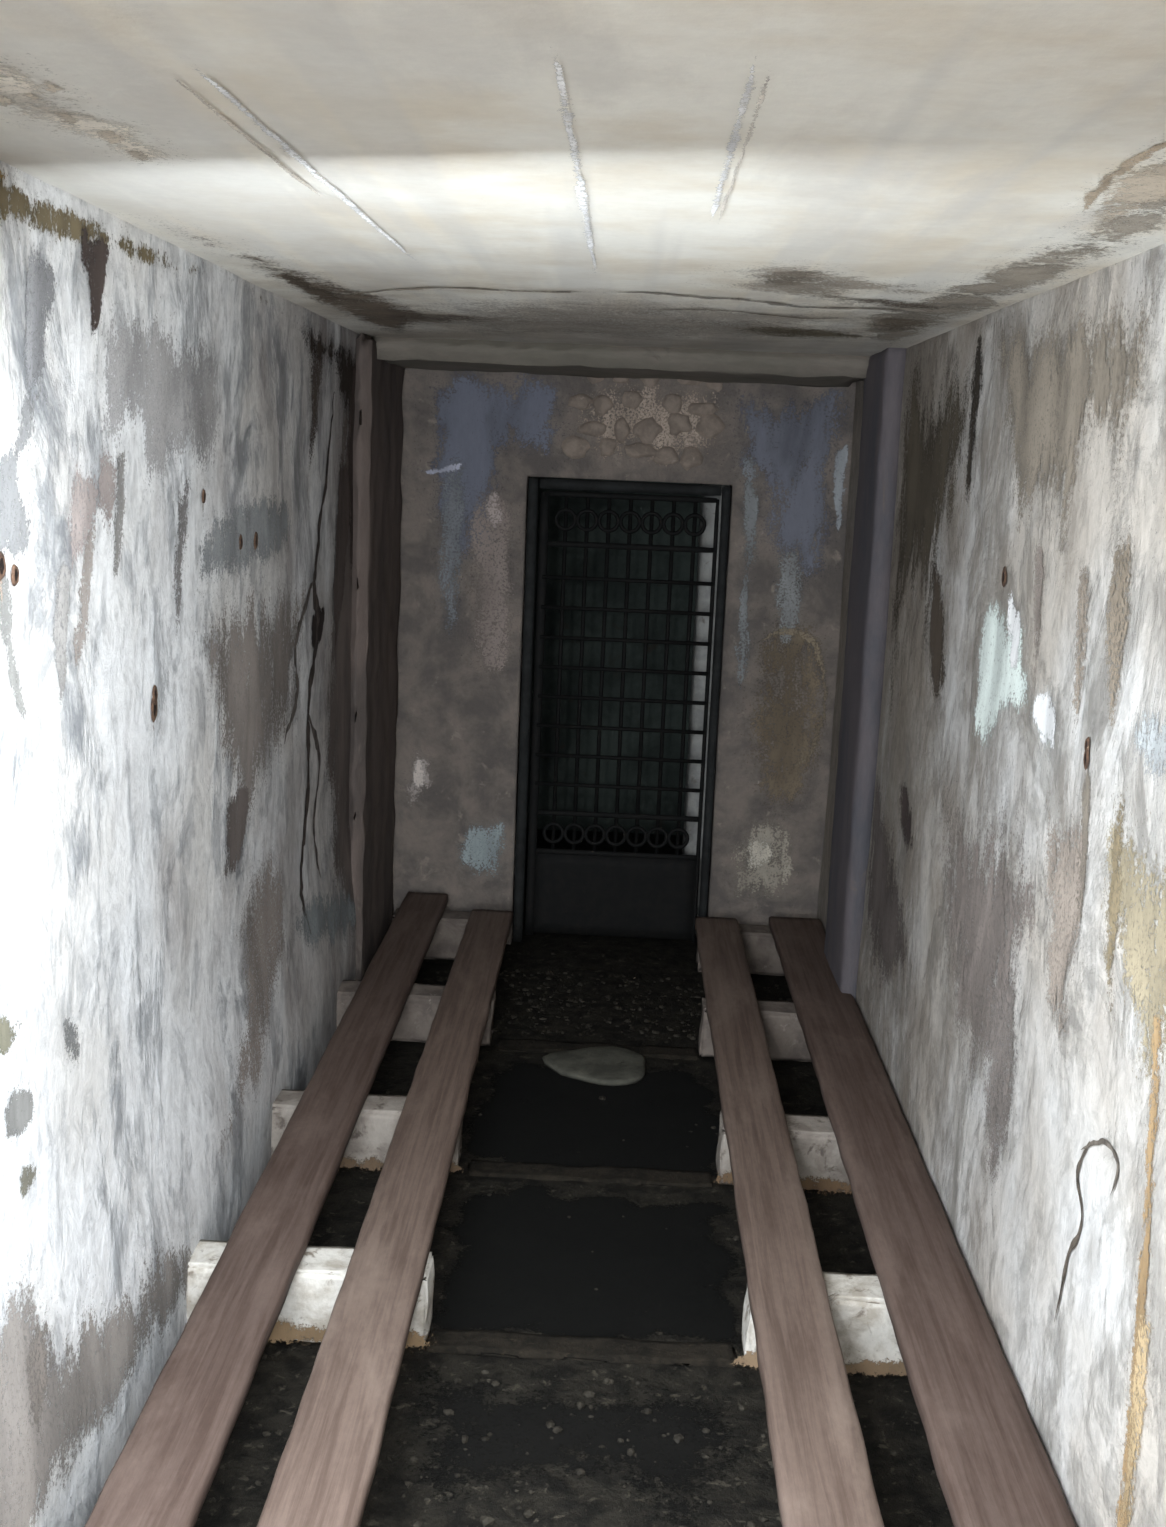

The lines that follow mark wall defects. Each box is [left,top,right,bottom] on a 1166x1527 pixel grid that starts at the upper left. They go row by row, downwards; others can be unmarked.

spalling [0,62,168,164]
water stain [0,169,356,1185]
crack [1054,1138,1118,1322]
rust [1100,799,1166,1527]